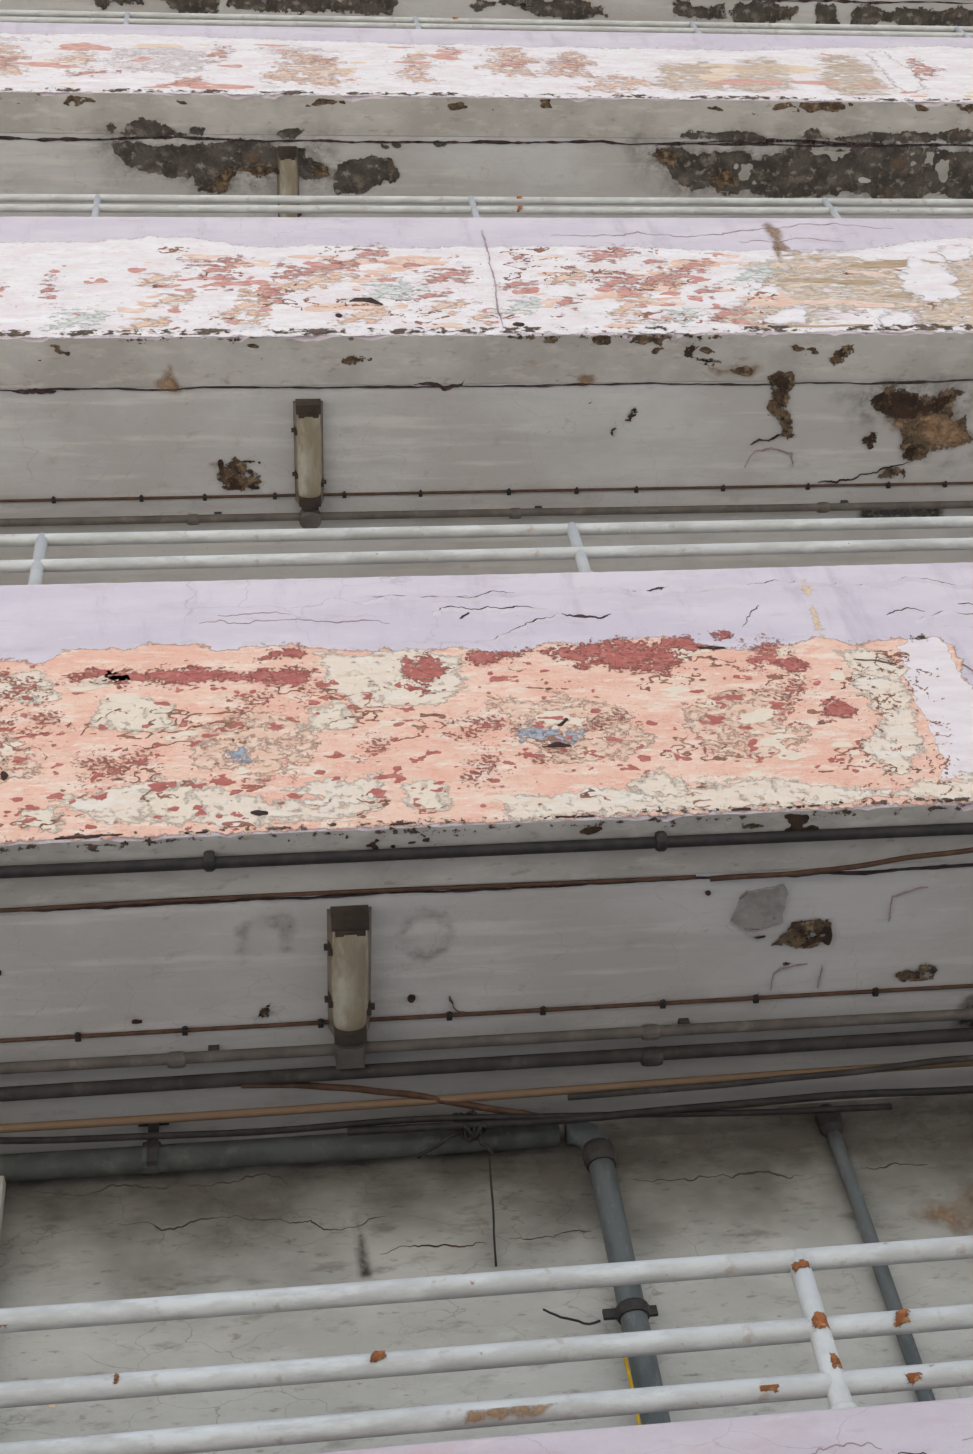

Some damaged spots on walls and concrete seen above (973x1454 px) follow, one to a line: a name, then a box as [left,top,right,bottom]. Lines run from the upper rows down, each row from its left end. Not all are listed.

peeling [94,0,399,16]
peeling [469,0,608,20]
peeling [672,0,973,26]
peeling [0,33,973,199]
peeling [0,235,973,367]
crack [201,576,973,646]
peeling [0,605,973,855]
crack [690,1172,799,1181]
crack [864,1162,928,1170]
crack [121,1218,213,1231]
crack [288,1216,591,1254]
crack [812,1442,926,1454]